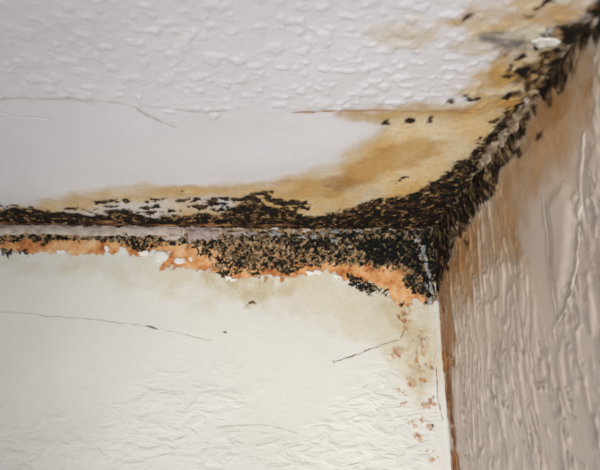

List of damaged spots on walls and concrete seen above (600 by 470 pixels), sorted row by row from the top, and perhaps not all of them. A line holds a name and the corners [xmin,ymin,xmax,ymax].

crack [0,98,224,128]
water stain [0,0,600,304]
peeling [0,225,435,315]
crack [7,312,210,341]
crack [332,315,406,363]